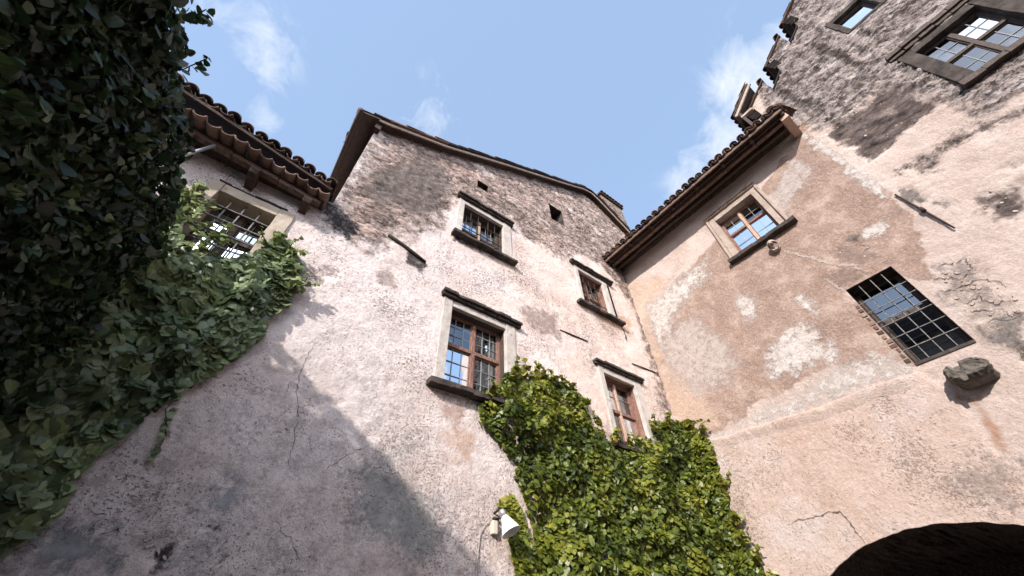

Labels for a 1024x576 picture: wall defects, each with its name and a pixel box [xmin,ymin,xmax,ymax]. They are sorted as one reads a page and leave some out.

flaking render [933,258,1024,351]
crack [284,339,368,475]
crack [792,511,868,546]